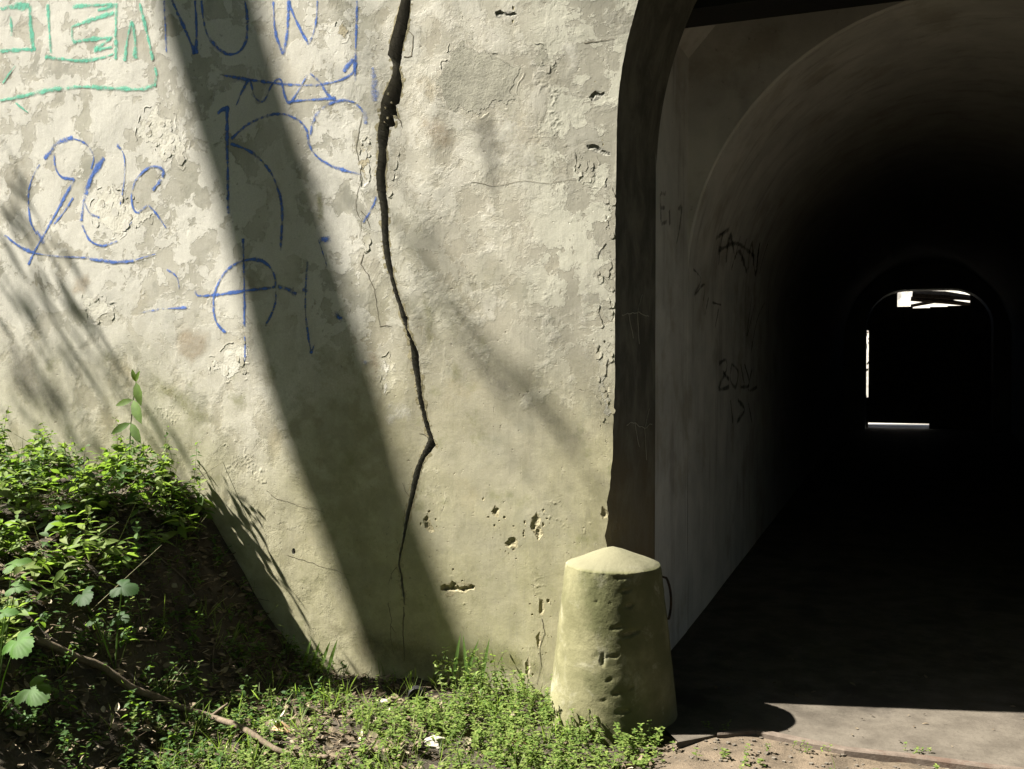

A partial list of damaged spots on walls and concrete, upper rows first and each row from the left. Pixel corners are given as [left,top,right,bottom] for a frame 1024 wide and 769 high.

peeling [434,39,572,140]
spalling [589,81,605,102]
peeling [134,101,191,171]
peeling [386,145,404,198]
peeling [89,182,156,241]
peeling [81,293,117,326]
crack [356,0,438,662]
peeling [572,139,616,424]
peeling [205,340,251,384]
spalling [420,510,437,533]
spalling [482,497,608,560]
spalling [440,568,475,597]